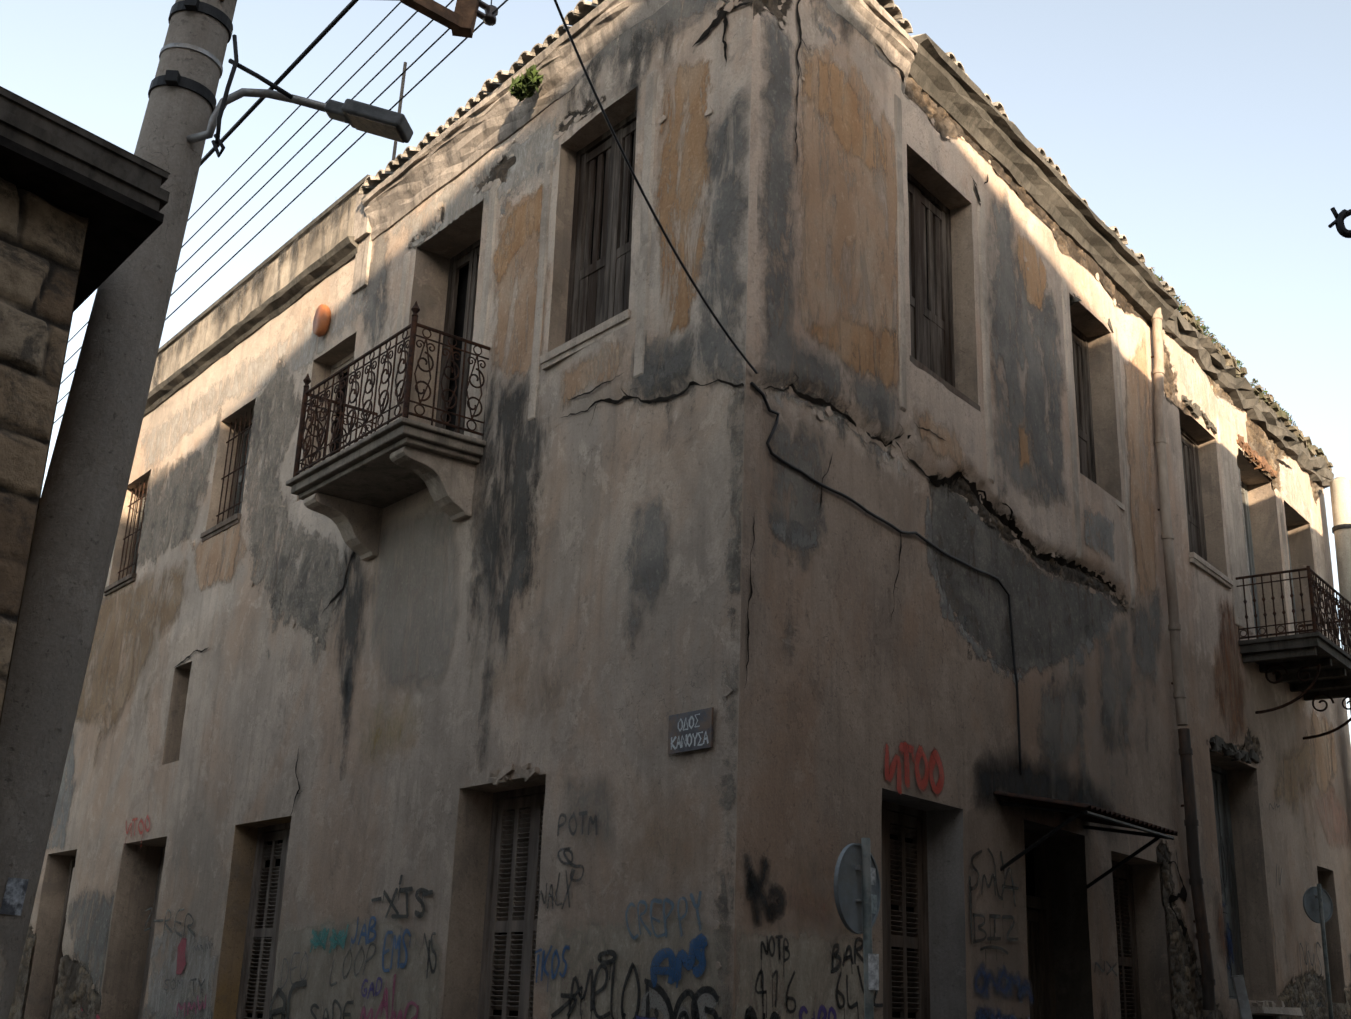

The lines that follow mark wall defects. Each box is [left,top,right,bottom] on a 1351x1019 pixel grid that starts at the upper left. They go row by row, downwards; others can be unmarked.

peeling [654,60,713,334]
crack [692,2,750,66]
spalling [715,0,793,30]
damp [632,16,895,437]
crack [795,0,810,191]
peeling [803,57,887,174]
peeling [811,316,896,389]
spalling [904,77,1323,698]
damp [474,382,540,646]
crack [561,359,1126,621]
damp [336,551,364,717]